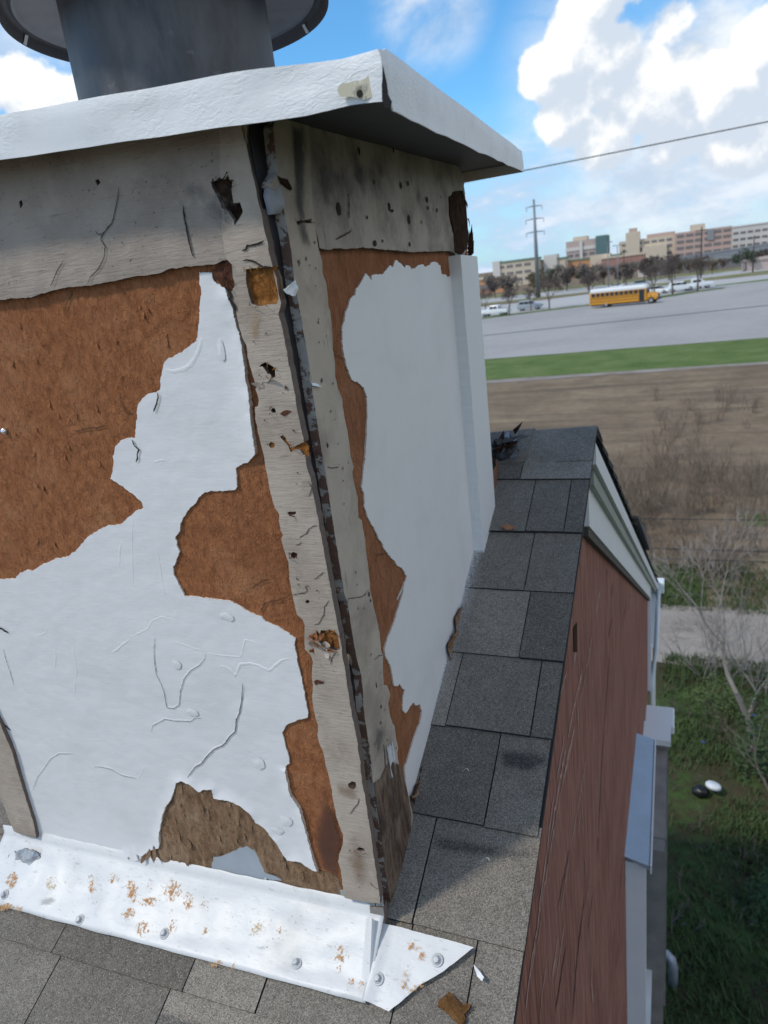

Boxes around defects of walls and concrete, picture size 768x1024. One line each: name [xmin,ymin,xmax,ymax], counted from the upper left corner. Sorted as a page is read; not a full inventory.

crack [50,188,119,310]
crack [183,206,194,258]
leakage [294,129,310,243]
peeling [0,260,283,579]
peeling [306,239,450,776]
peeling [174,342,360,890]
crack [111,616,263,778]
crack [33,752,73,789]
rust [110,876,209,938]